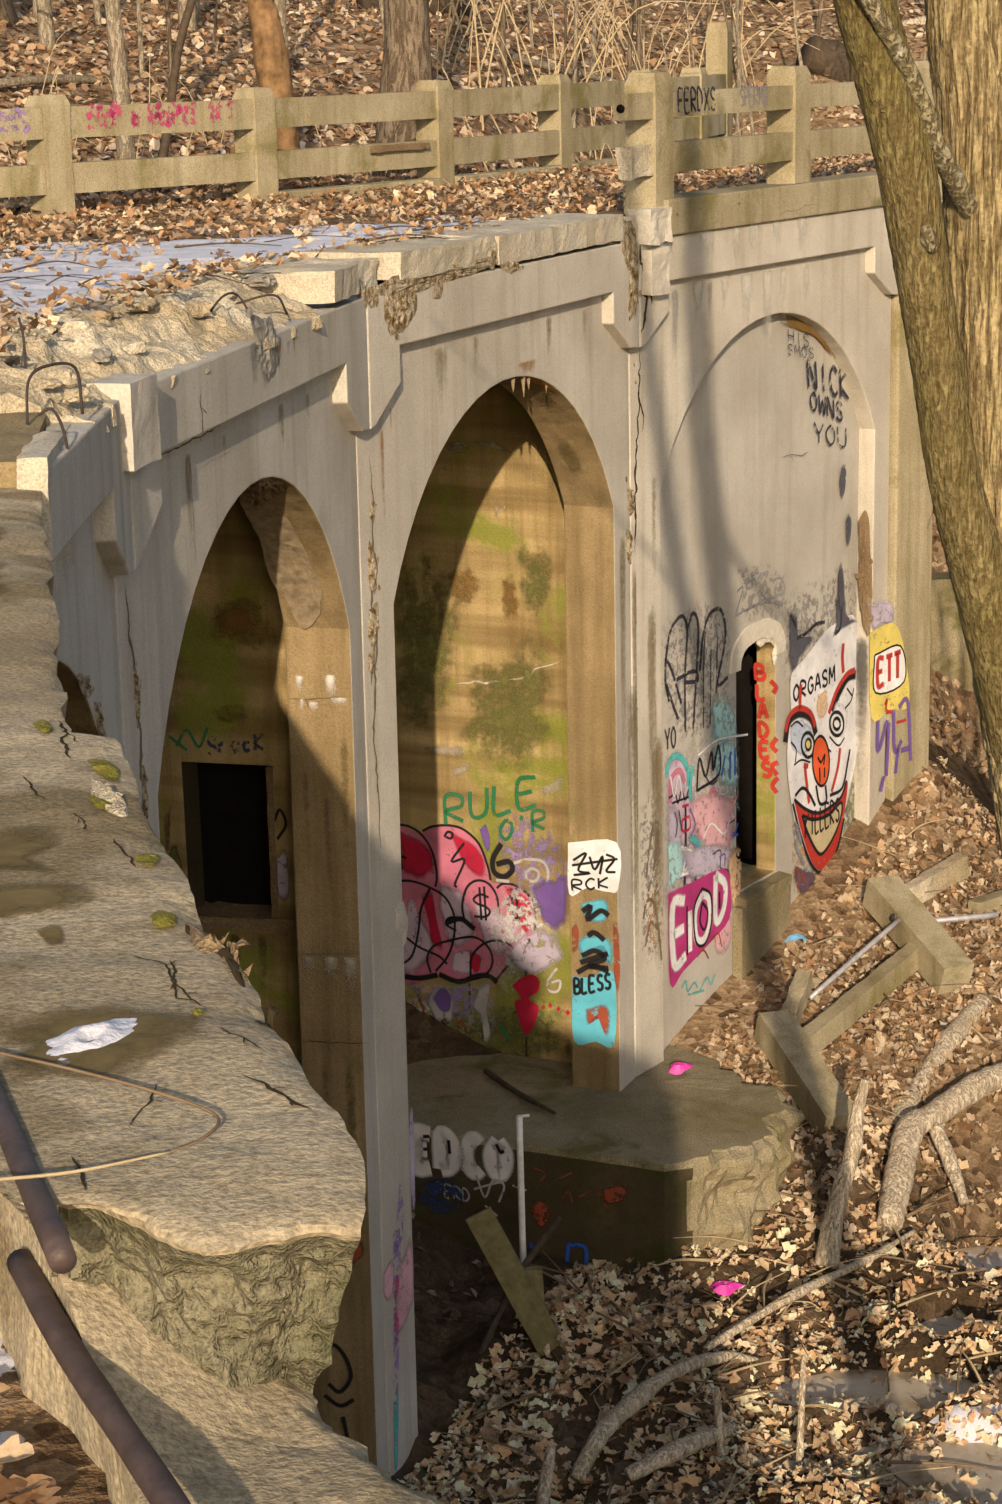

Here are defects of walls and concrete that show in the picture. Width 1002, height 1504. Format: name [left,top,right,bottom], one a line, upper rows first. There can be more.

spalling [357,248,524,339]
spalling [620,219,642,321]
spalling [0,266,323,450]
crack [634,244,652,540]
leakage [503,552,549,615]
leakage [397,557,477,724]
spalling [77,673,107,737]
spalling [133,661,142,728]
leakage [432,658,549,775]
spalling [91,765,149,819]
leakage [433,1013,556,1058]